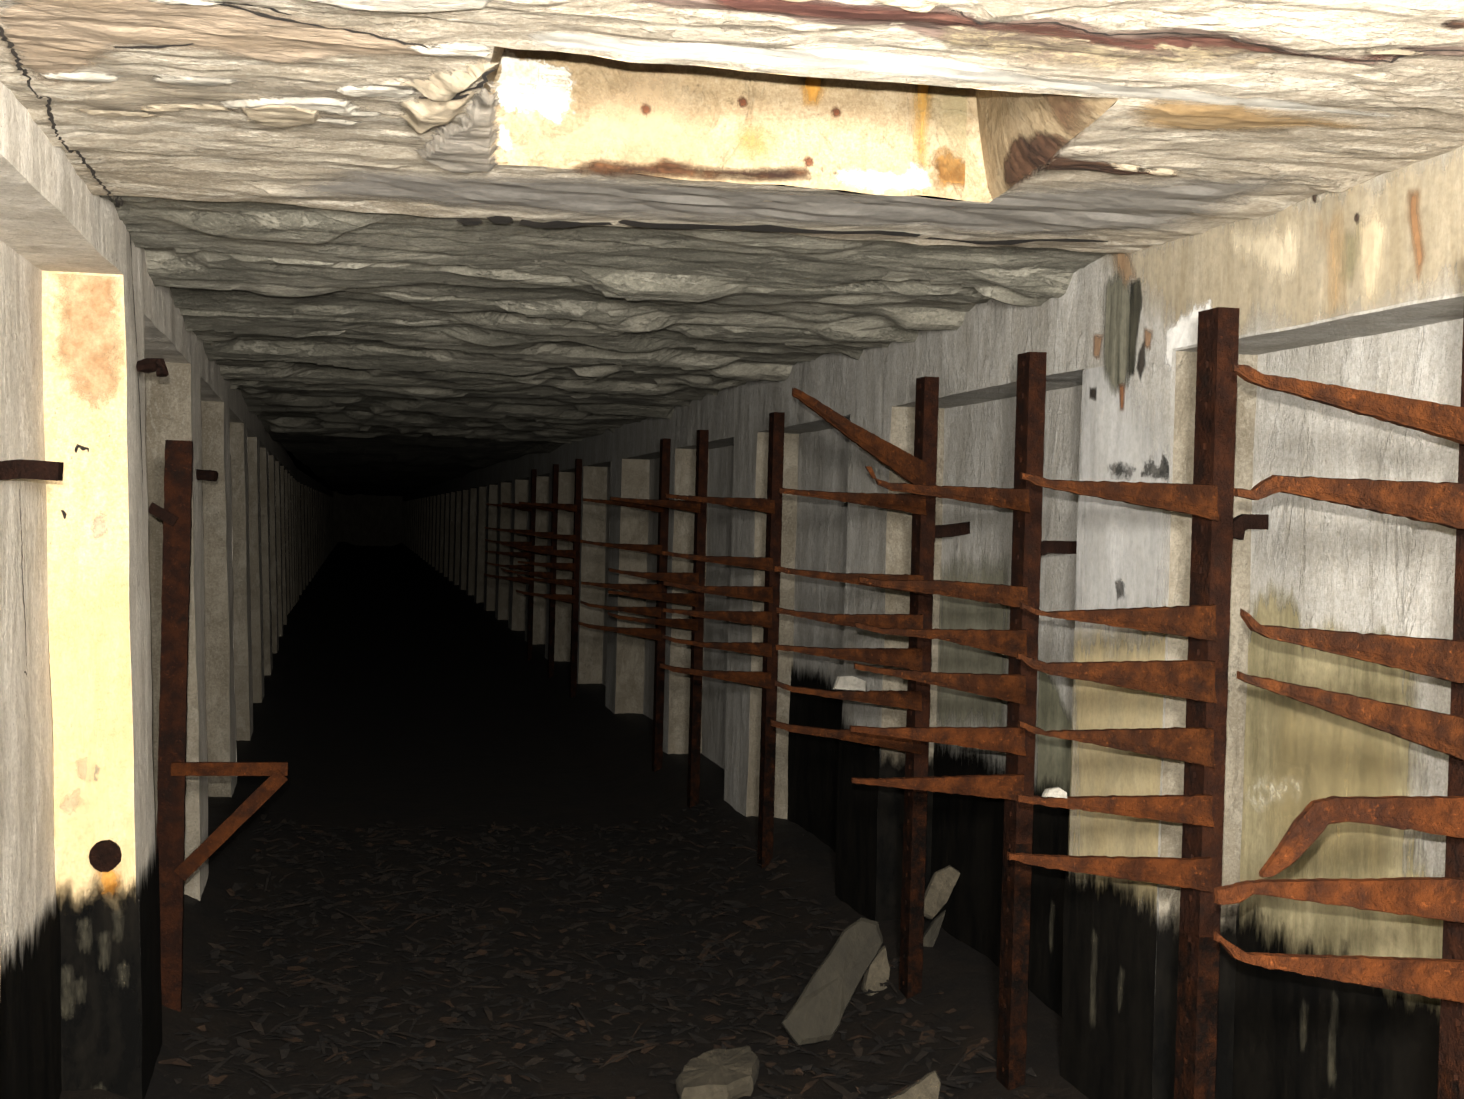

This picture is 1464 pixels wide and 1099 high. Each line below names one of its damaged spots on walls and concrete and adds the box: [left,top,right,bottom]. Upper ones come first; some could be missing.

crack [0,26,143,498]
peeling [0,0,574,173]
rust [575,159,808,181]
leakage [314,147,1464,409]
spalling [638,0,1464,69]
spalling [1004,94,1181,188]
crack [19,489,54,815]
leakage [0,843,162,1099]
leakage [1215,590,1443,1099]